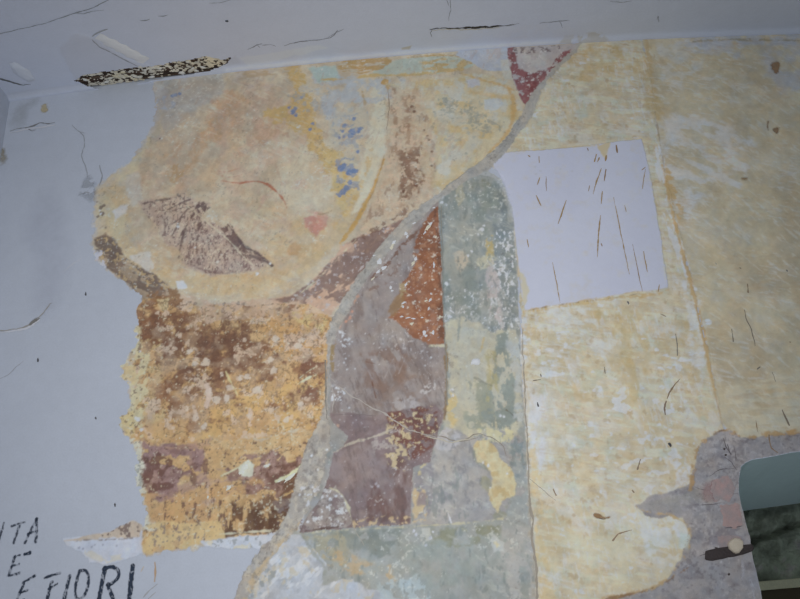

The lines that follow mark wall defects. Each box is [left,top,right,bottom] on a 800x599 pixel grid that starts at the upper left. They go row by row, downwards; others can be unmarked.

crack [0,0,108,34]
crack [430,1,515,36]
flaking render [74,56,231,86]
crack [10,122,103,196]
peeling [507,34,800,599]
crack [325,360,506,454]
peeling [63,519,143,565]